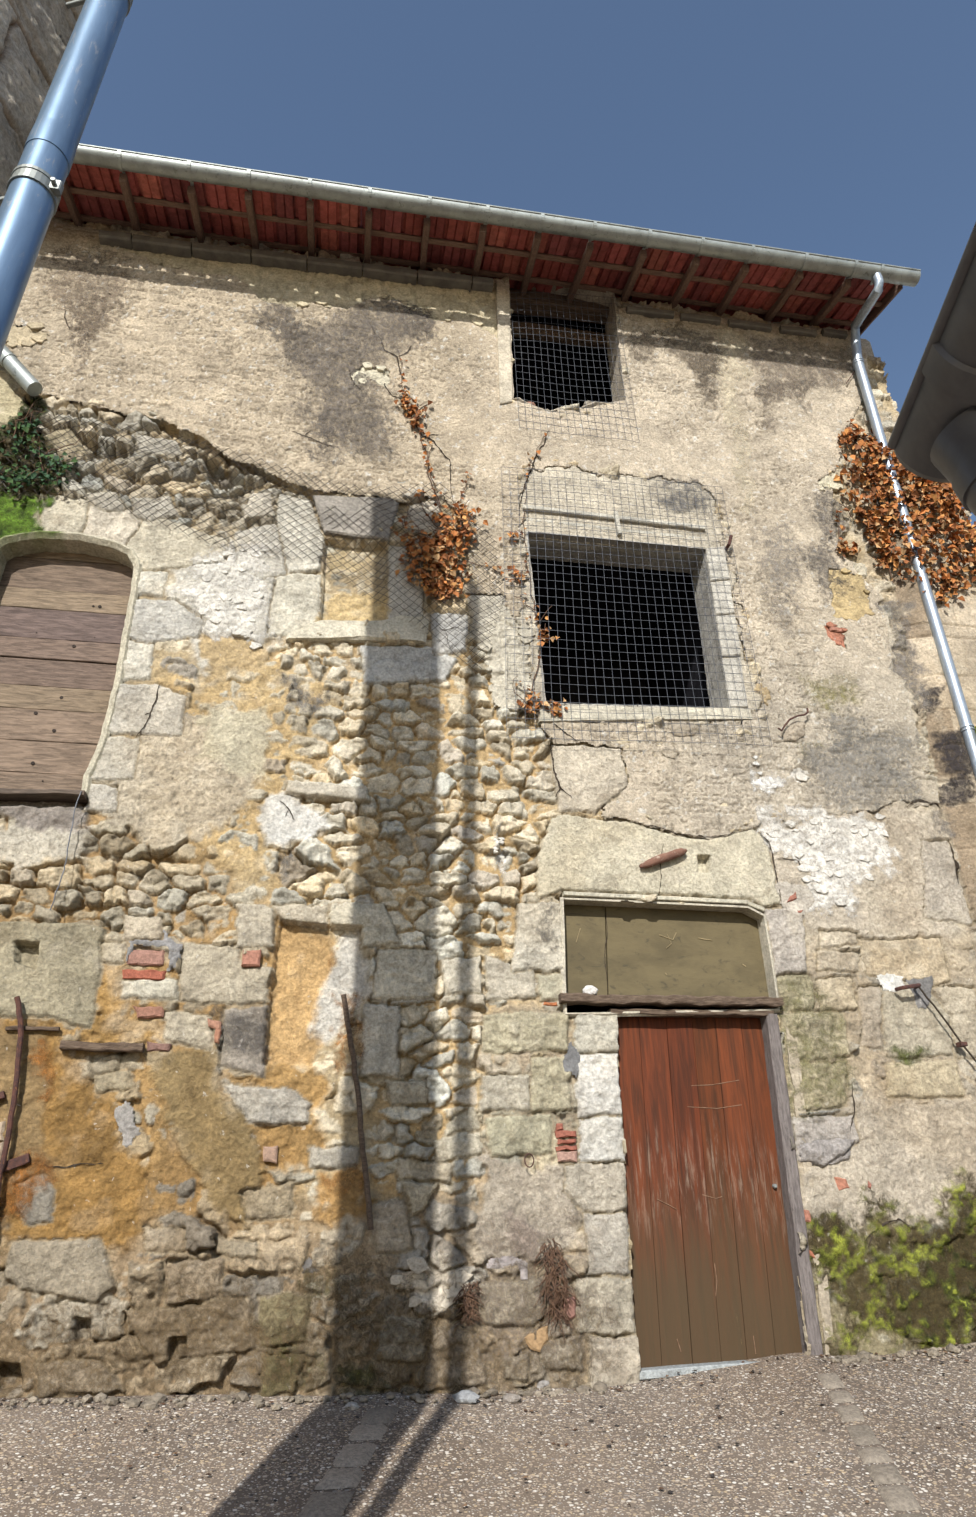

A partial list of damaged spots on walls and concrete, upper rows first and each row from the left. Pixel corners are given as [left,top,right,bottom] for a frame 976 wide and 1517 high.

leakage [43,247,128,370]
leakage [251,298,435,465]
leakage [627,320,851,514]
crack [519,432,548,515]
peeling [178,543,276,650]
flaking render [477,604,536,713]
crack [550,723,576,798]
peeling [488,833,511,873]
corrosion [0,1151,54,1218]
leakage [805,1212,847,1268]
peeling [390,1250,473,1314]